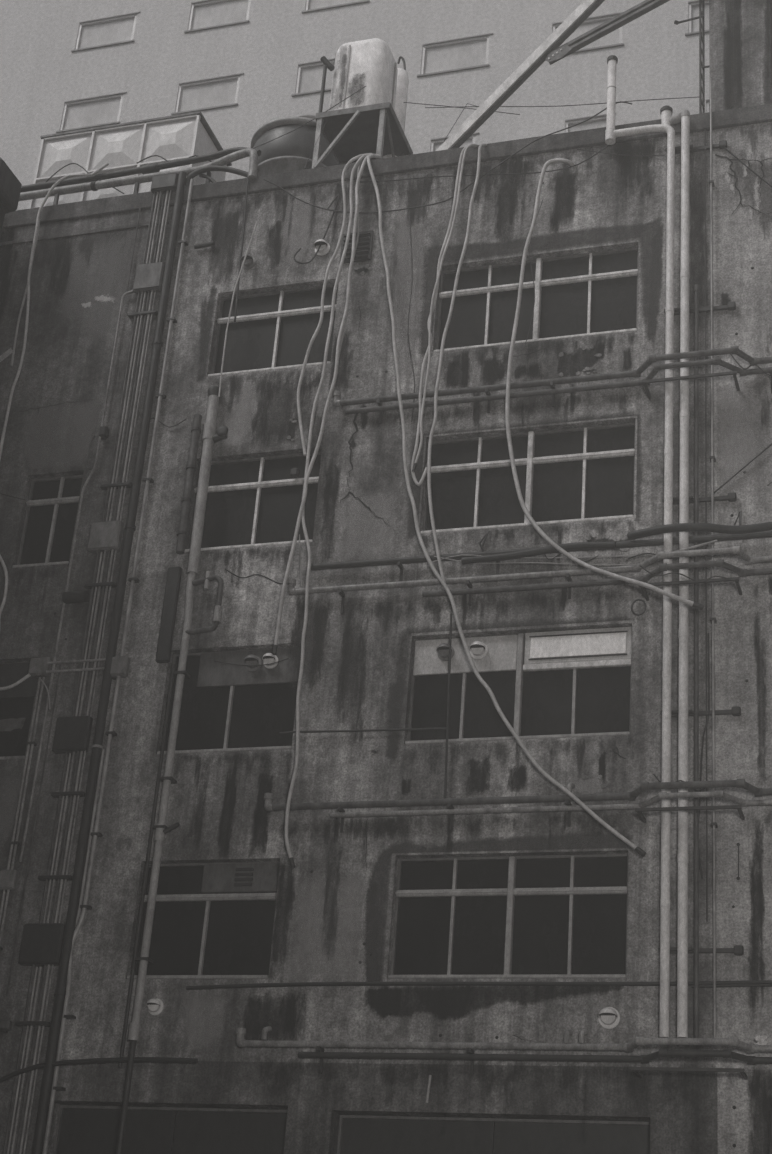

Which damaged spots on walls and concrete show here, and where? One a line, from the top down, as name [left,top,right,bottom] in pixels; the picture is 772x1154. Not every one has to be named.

leakage [495,156,526,241]
leakage [551,166,576,233]
crack [715,154,772,214]
leakage [229,338,351,450]
leakage [446,353,545,388]
crack [340,413,395,531]
leakage [754,617,765,776]
leakage [218,762,237,856]
leakage [251,774,272,852]
leakage [468,757,489,793]
leakage [508,765,526,790]
leakage [748,824,765,1007]